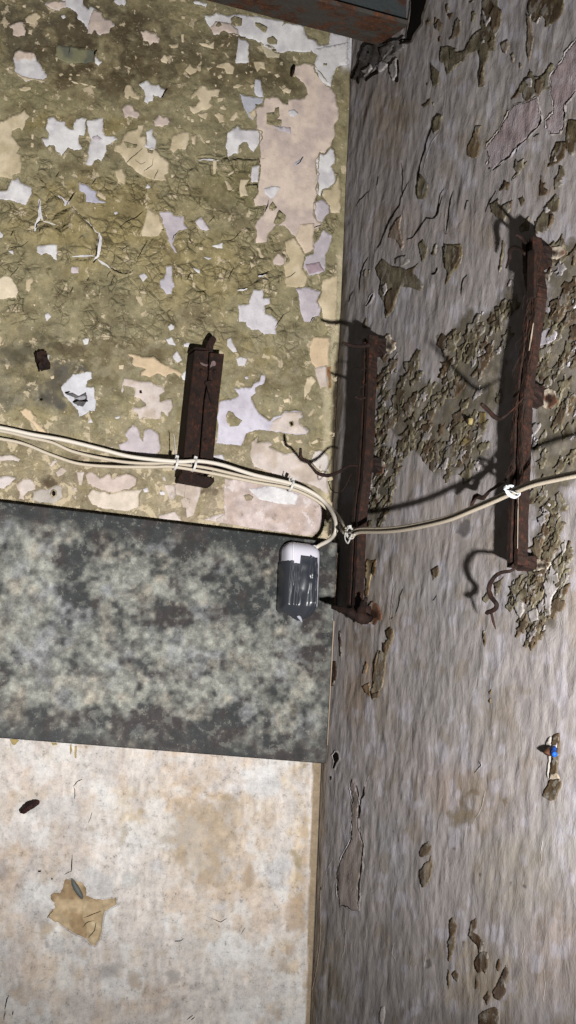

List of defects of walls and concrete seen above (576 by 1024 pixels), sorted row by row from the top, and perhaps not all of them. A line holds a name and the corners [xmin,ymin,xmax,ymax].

crack [197,153,220,161]
crack [10,173,177,293]
crack [228,268,294,291]
peeling [0,0,565,537]
peeling [482,120,576,651]
peeling [362,559,394,700]
peeling [542,733,562,801]
peeling [47,878,118,948]
peeling [447,917,509,1024]